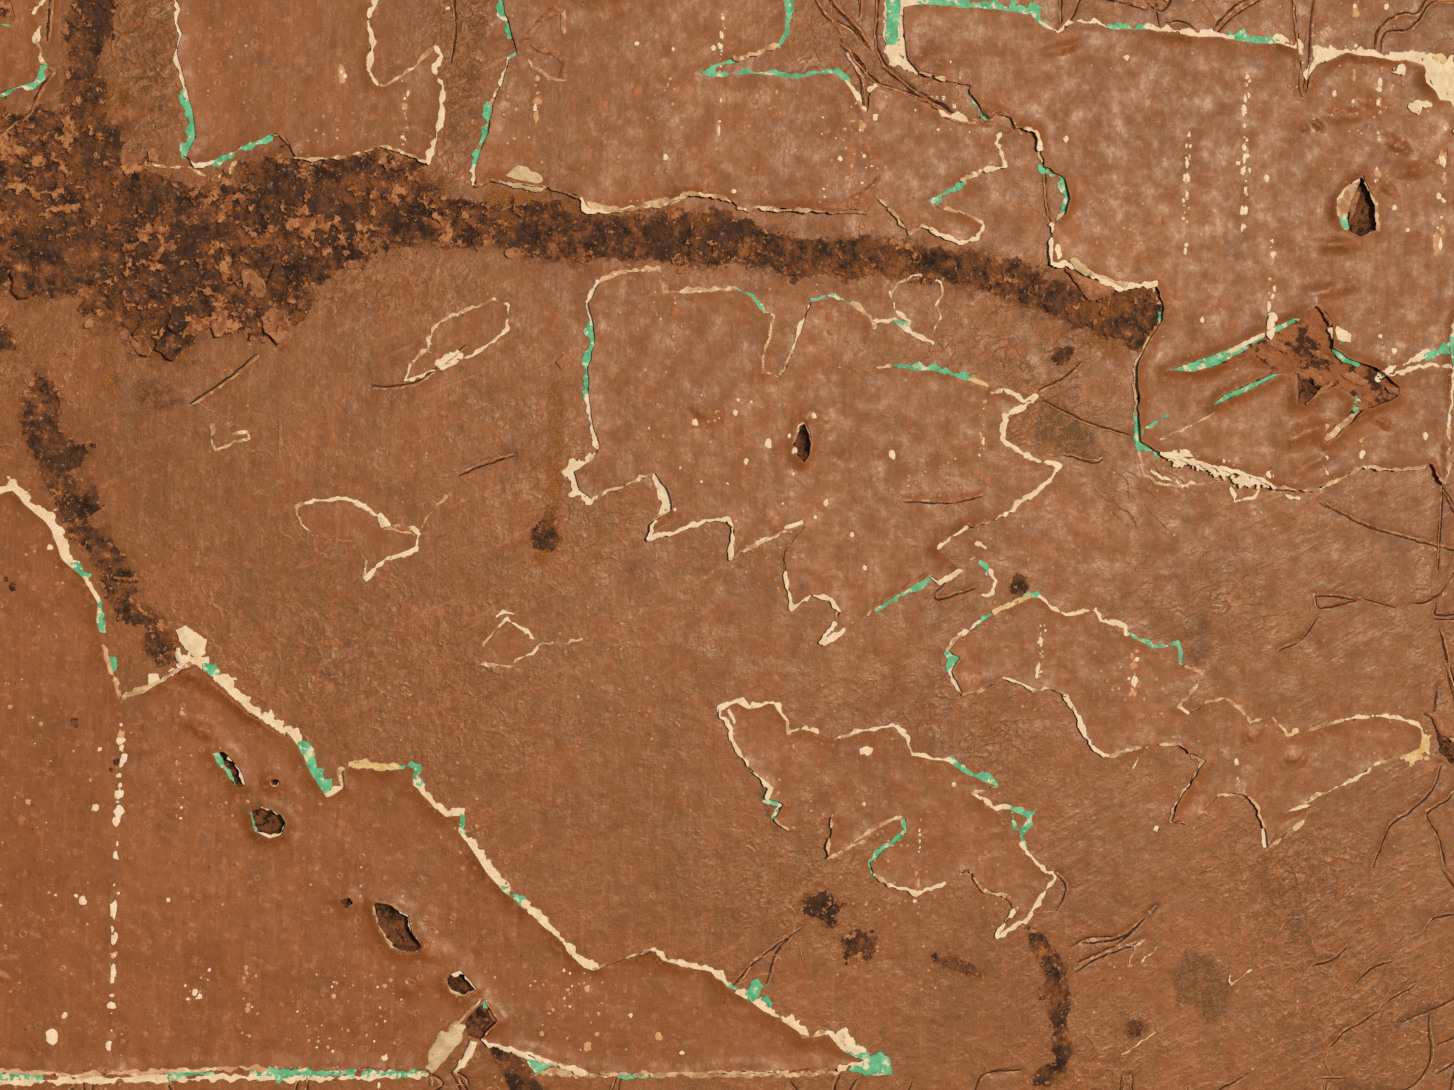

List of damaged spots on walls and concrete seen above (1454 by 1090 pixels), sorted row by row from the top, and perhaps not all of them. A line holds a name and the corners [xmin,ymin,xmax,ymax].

corrosion [0,0,1164,366]
crack [815,0,984,144]
peeling [470,0,1454,502]
crack [1032,0,1319,97]
corrosion [19,372,178,668]
peeling [562,266,1454,848]
crack [1278,477,1454,717]
peeling [0,476,892,1086]
peeling [716,697,1056,939]
corrosion [488,1046,544,1090]
corrosion [1026,926,1073,1088]
crack [1311,937,1454,1090]